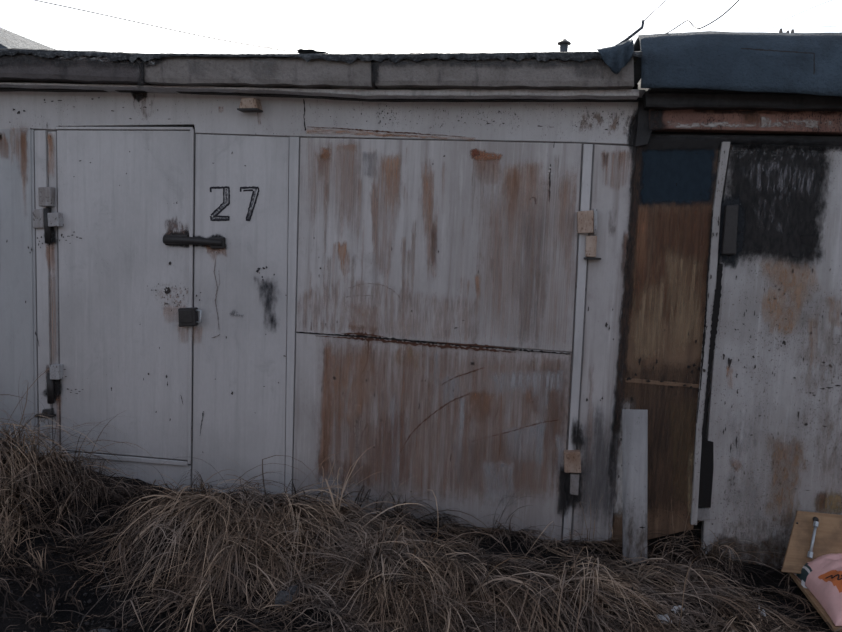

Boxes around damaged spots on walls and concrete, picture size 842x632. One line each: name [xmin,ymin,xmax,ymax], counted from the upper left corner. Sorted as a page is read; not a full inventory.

rust [471,149,502,161]
rust [625,357,701,515]